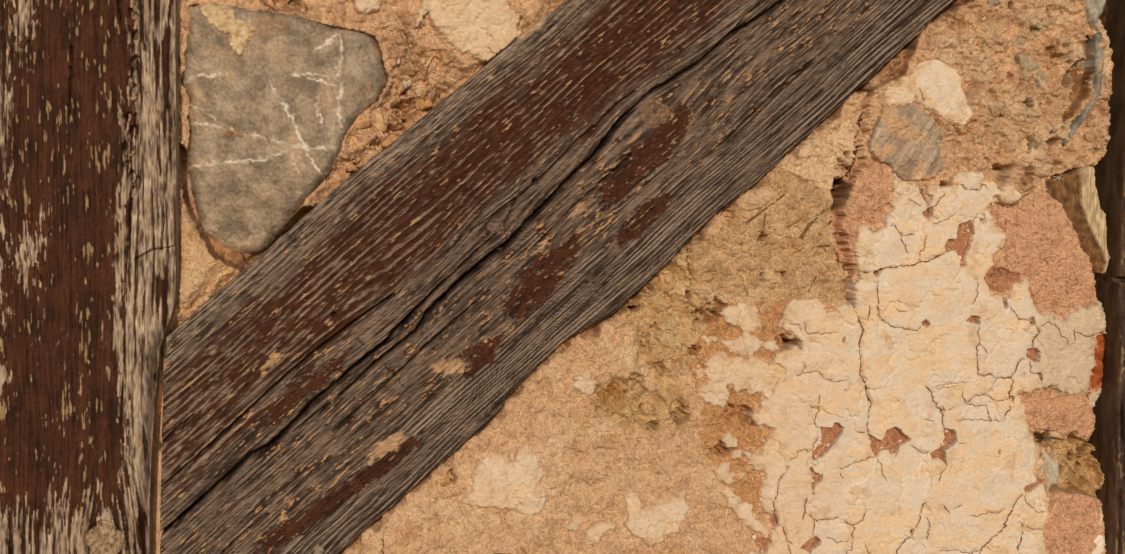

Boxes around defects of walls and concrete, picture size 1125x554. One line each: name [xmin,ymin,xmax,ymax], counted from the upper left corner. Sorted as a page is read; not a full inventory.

peeling [0,0,176,554]
crack [164,0,781,528]
peeling [561,0,1114,554]
crack [833,74,864,185]
crack [773,184,1044,554]
crack [923,283,1094,444]